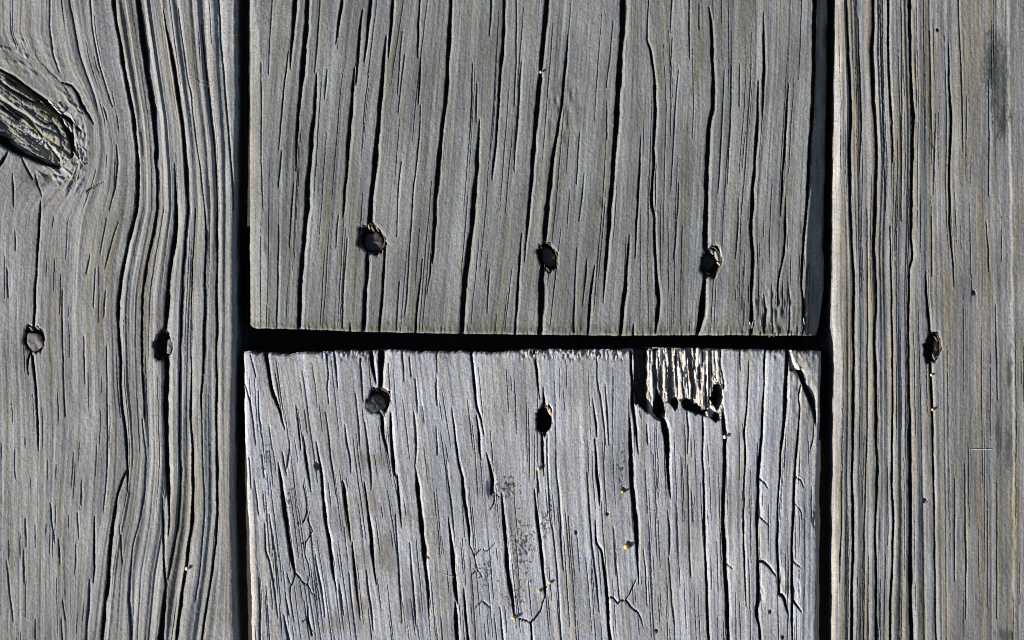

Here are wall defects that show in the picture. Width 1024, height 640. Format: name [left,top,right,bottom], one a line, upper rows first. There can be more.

spalling [632,348,724,420]
crack [696,0,817,640]